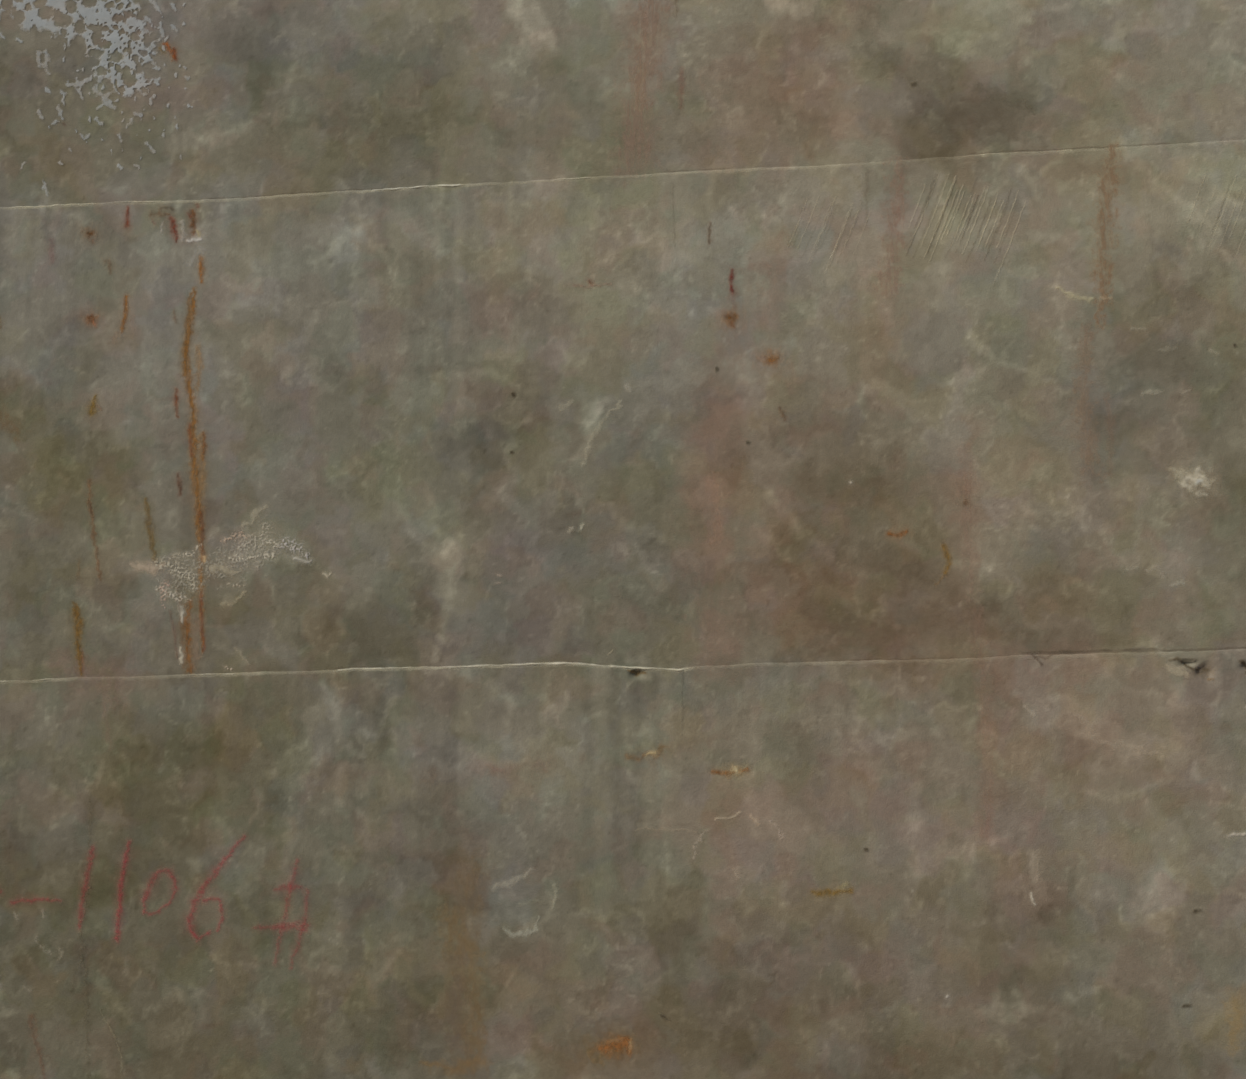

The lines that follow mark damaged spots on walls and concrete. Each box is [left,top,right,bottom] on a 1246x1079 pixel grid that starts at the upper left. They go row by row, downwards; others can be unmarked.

peeling [0,0,169,107]
corrosion [175,258,206,673]
water stain [137,526,308,620]